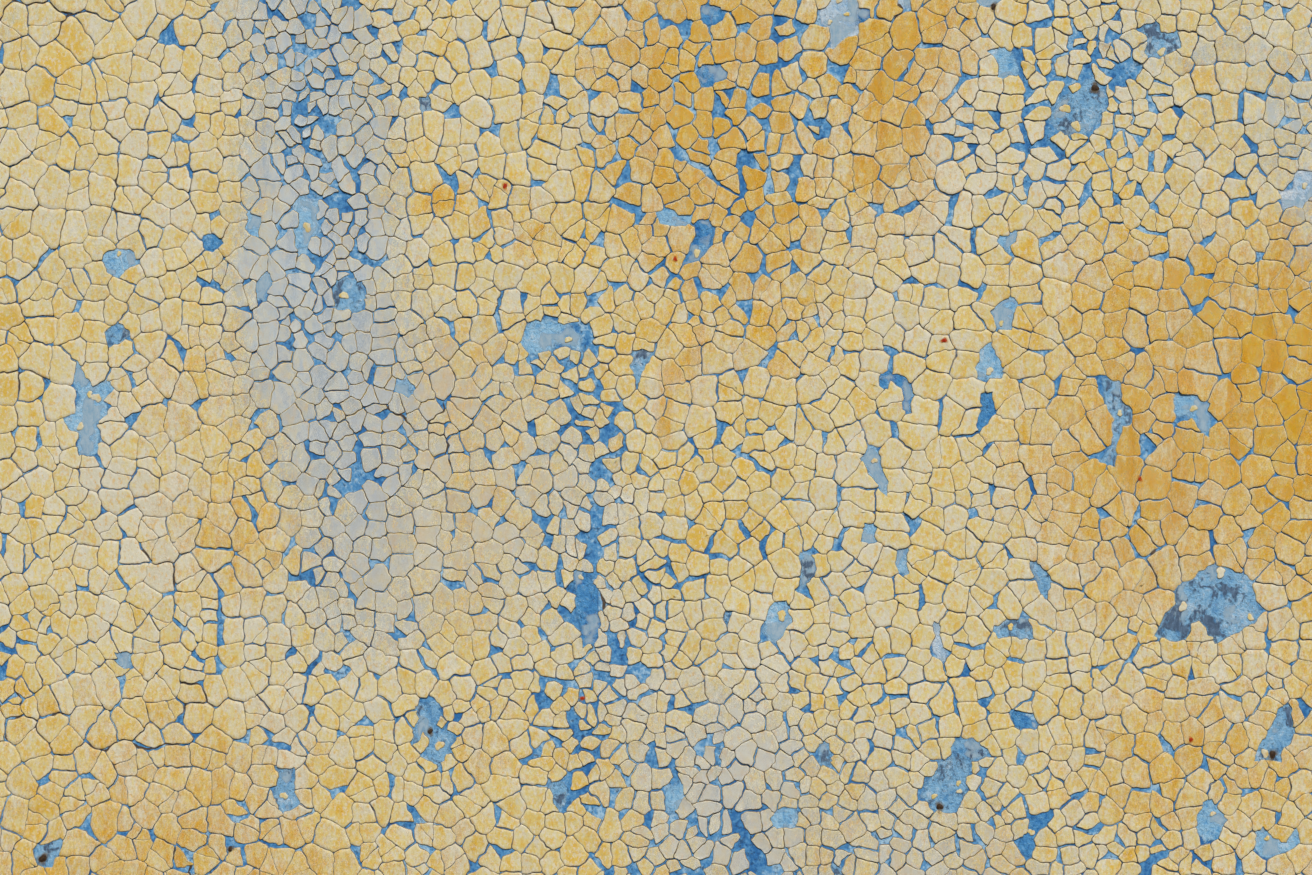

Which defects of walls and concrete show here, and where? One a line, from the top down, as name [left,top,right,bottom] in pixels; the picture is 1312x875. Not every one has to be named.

crack [0,0,95,34]
peeling [0,0,95,143]
peeling [75,0,136,45]
crack [546,6,598,52]
peeling [1051,79,1108,137]
crack [107,132,144,240]
peeling [42,361,114,456]
crack [380,402,451,466]
crack [119,544,237,640]
peeling [1146,545,1261,644]
crack [5,654,235,781]
peeling [921,738,989,813]